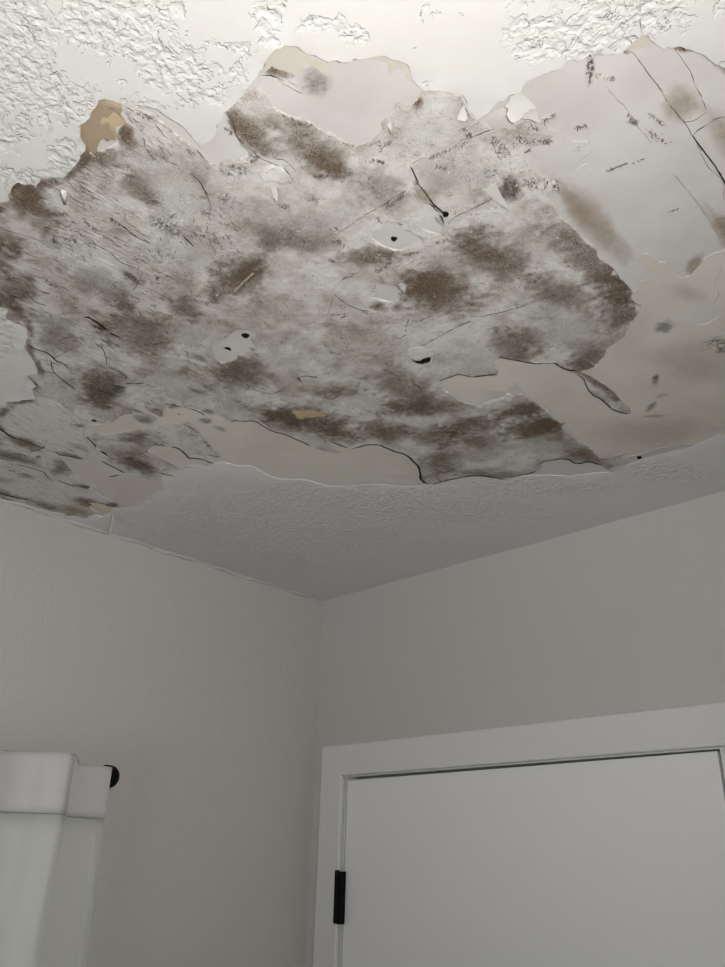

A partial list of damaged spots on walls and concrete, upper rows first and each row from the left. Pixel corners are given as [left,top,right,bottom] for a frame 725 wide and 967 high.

crack [633,23,725,235]
damp [12,152,115,234]
crack [341,155,491,231]
damp [210,260,262,301]
peeling [0,35,725,535]
damp [395,270,474,313]
damp [550,225,635,325]
crack [26,316,143,389]
crack [0,429,212,486]
damp [264,408,358,438]
crack [332,442,599,484]
damp [418,402,599,461]